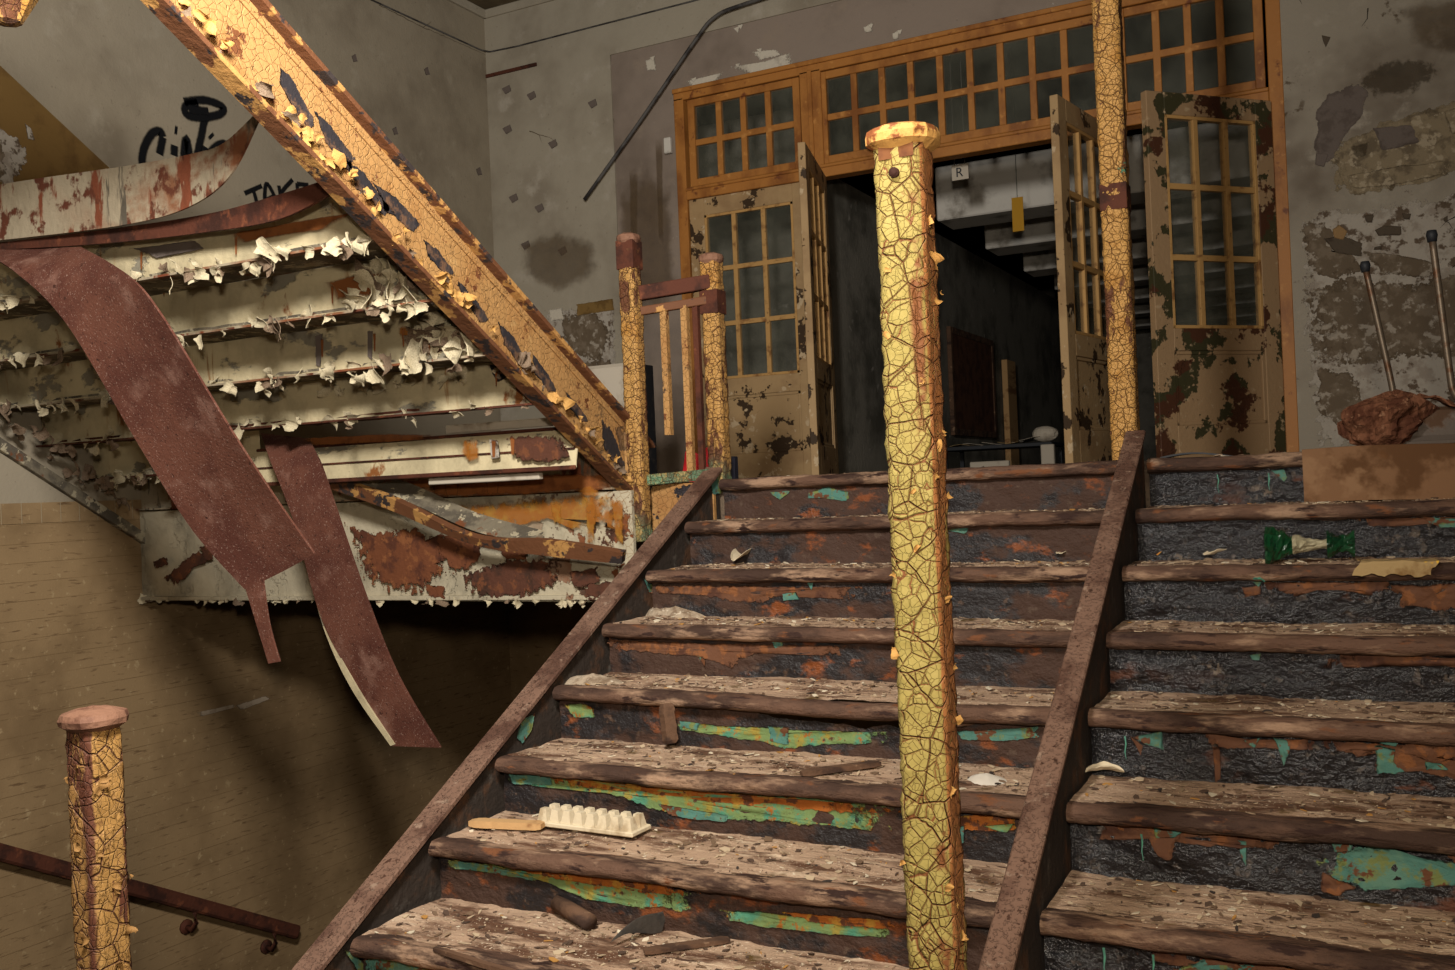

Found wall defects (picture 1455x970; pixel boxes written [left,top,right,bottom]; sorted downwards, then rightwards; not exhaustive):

corrosion [234,213,349,255]
peeling [130,68,633,482]
peeling [1300,84,1455,447]
corrosion [407,435,623,542]
corrosion [153,546,213,585]
corrosion [344,522,611,599]
peeling [678,721,887,749]
peeling [1085,761,1124,772]
peeling [508,774,901,832]
peeling [448,859,701,912]
peeling [1316,843,1455,896]
peeling [720,910,900,937]